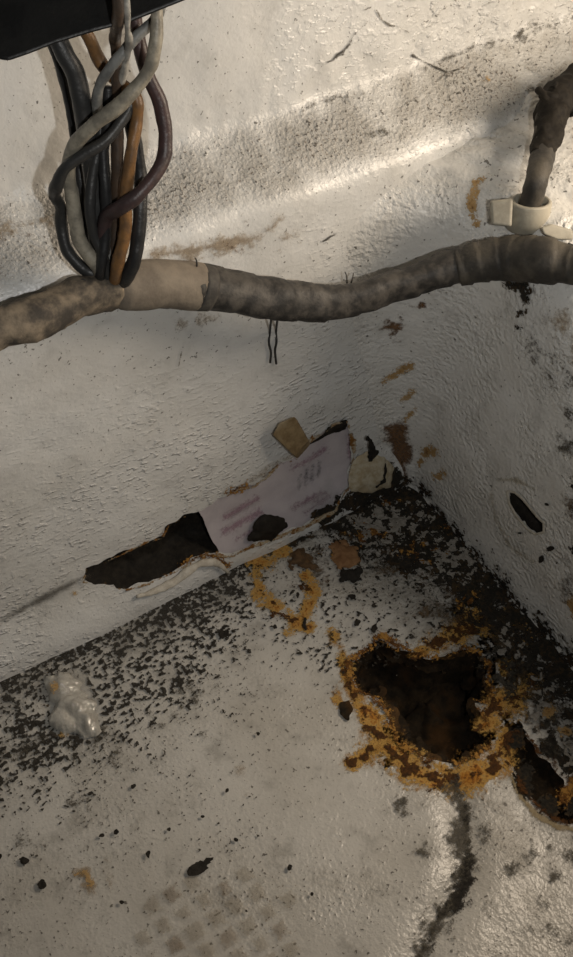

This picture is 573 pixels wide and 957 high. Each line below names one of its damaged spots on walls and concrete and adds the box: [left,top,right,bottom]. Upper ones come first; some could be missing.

corrosion [466,176,486,228]
corrosion [381,363,415,384]
spalling [84,512,219,589]
spalling [510,493,543,534]
corrosion [177,389,573,800]
spalling [0,541,573,834]
peeling [437,794,478,918]